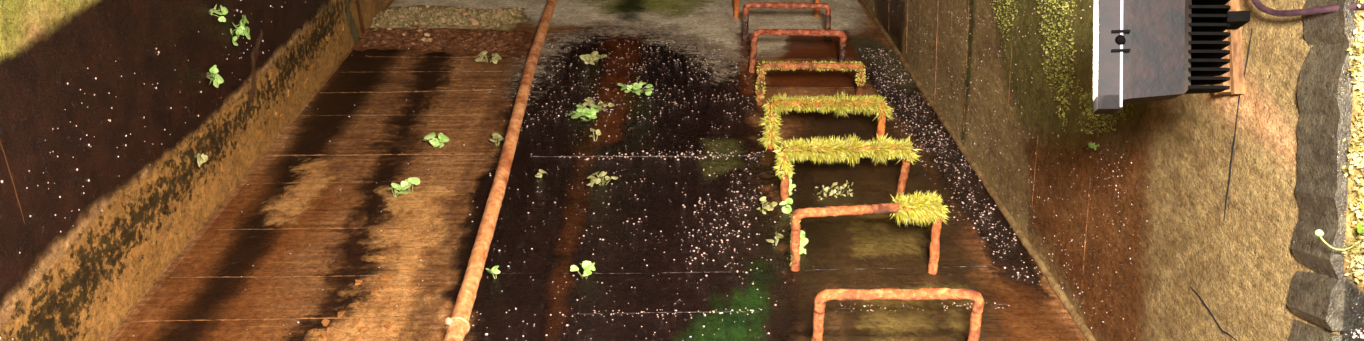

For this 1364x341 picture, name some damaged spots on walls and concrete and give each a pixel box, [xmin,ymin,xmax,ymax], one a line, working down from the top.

damp [443,0,1053,341]
rust [737,30,866,95]